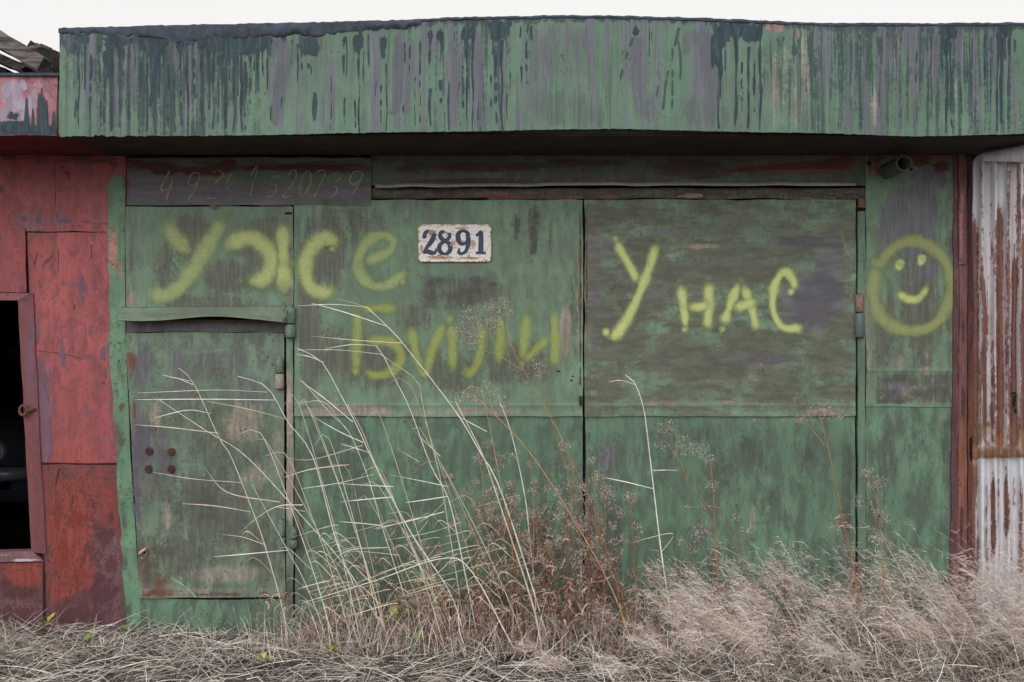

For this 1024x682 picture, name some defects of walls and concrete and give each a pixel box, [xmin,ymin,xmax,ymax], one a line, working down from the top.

peeling [0,79,44,119]
corrosion [959,195,1024,579]
corrosion [119,398,176,524]